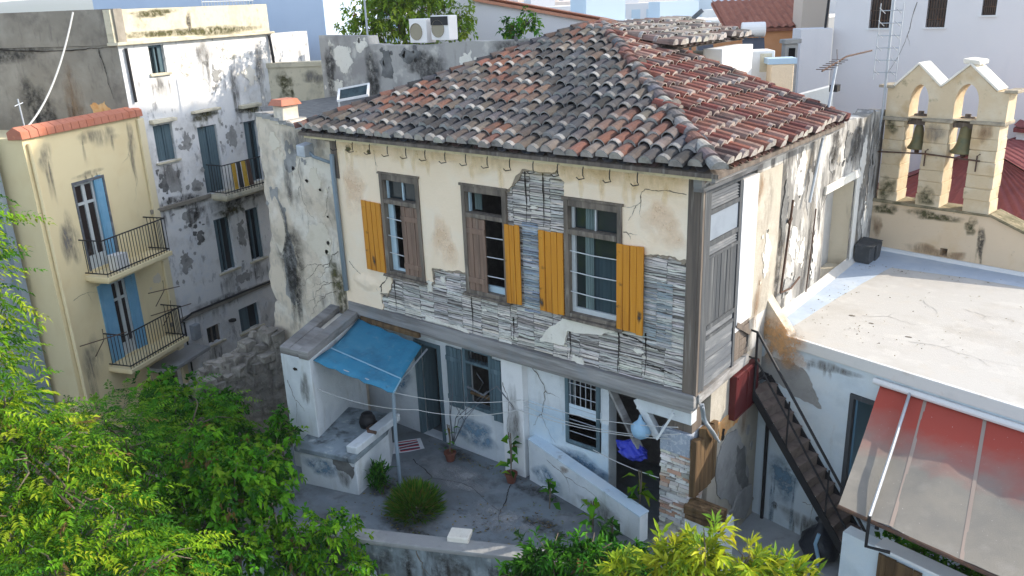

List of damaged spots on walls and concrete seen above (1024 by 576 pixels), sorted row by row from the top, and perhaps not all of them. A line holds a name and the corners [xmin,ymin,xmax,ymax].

flaking render [325,37,426,92]
mould [160,194,204,219]
leakage [219,194,257,217]
crack [623,189,686,236]
flaking render [759,148,818,298]
leakage [916,210,984,256]
peeling [761,320,822,409]
crack [532,368,610,512]